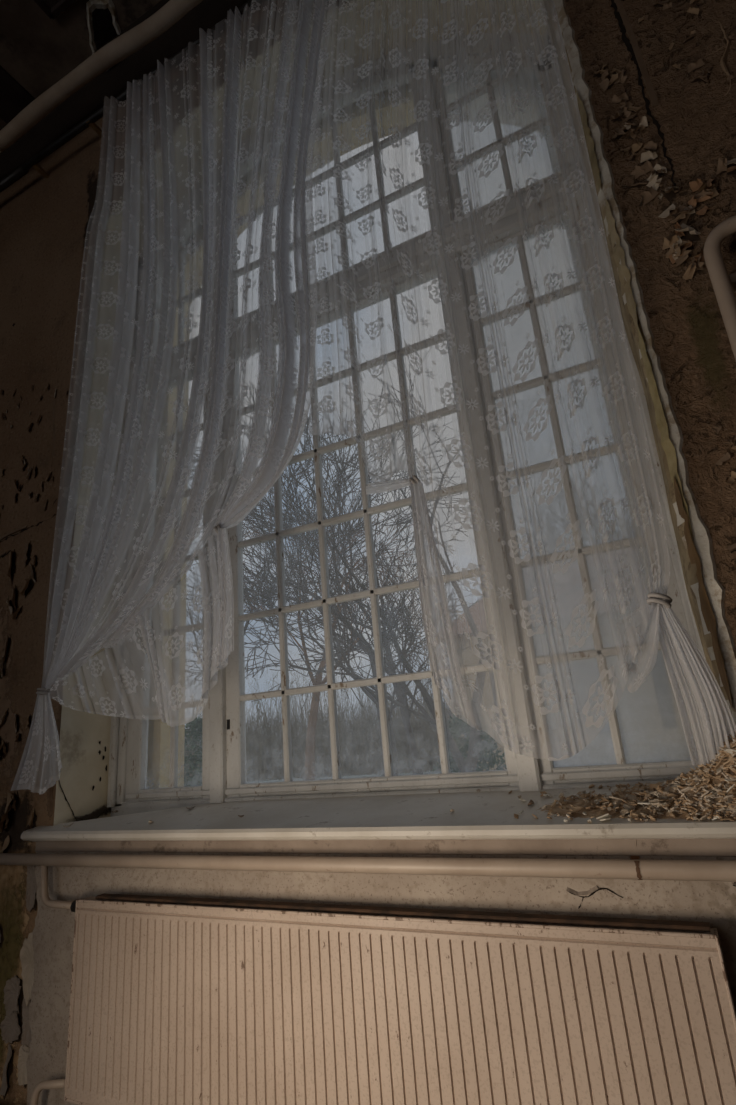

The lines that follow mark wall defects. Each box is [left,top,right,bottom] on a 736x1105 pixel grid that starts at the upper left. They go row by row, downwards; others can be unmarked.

crack [610,0,676,186]
flaking render [544,0,736,724]
peeling [6,541,38,619]
flaking render [26,766,53,842]